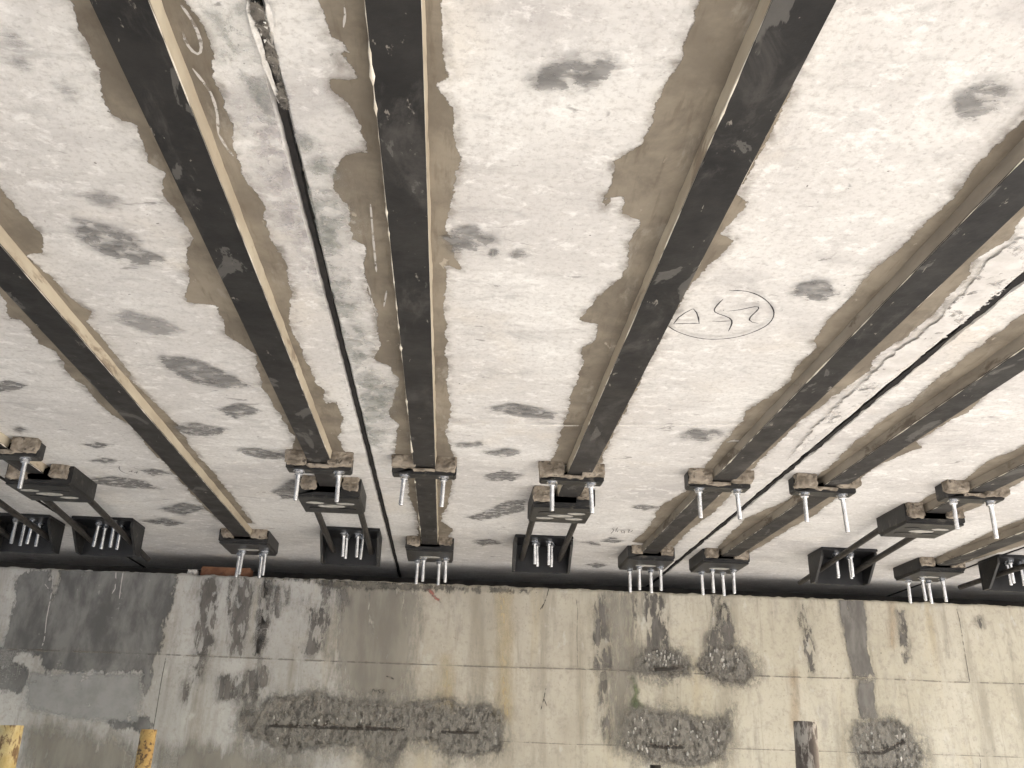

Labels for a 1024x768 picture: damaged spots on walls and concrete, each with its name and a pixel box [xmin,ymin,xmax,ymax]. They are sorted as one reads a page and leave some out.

water stain [0,569,178,768]
water stain [182,577,530,727]
spalling [634,644,757,686]
water stain [838,600,878,719]
water stain [157,743,310,768]
spalling [237,690,504,768]
spalling [620,708,733,767]
spalling [851,717,927,768]